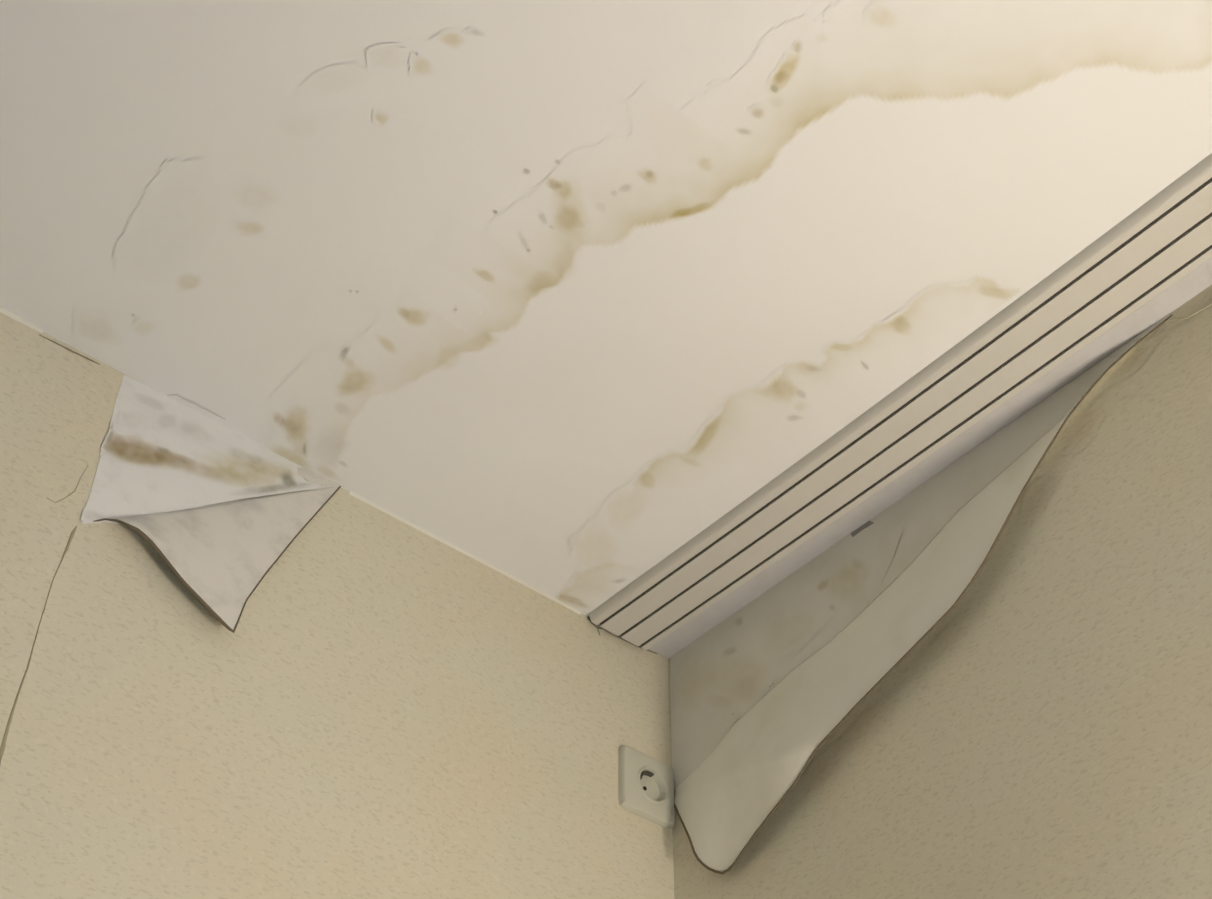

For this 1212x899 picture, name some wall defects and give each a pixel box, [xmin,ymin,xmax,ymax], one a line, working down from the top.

leakage [100,0,1212,497]
crack [47,465,88,503]
flaking render [82,375,338,525]
leakage [553,274,1023,616]
flaking render [851,521,874,537]
crack [0,526,77,764]
leakage [803,690,903,793]
leakage [745,839,787,885]